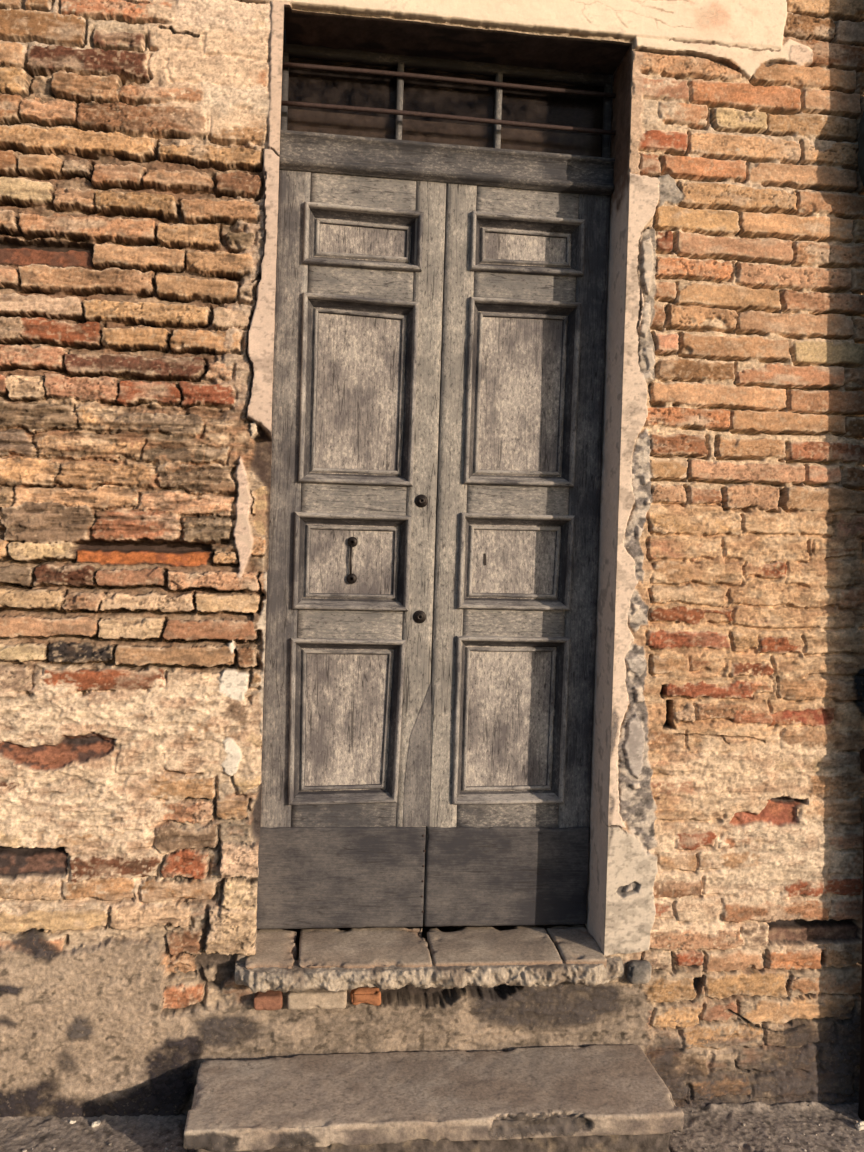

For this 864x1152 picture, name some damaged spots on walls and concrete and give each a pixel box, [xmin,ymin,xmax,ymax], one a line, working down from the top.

crack [569,0,780,52]
flaking render [637,227,658,385]
spalling [248,419,272,571]
flaking render [617,428,658,854]
spalling [0,732,116,772]
spalling [729,796,807,827]
spalling [0,846,70,880]
flaking render [616,881,641,898]
spalling [489,1108,595,1140]